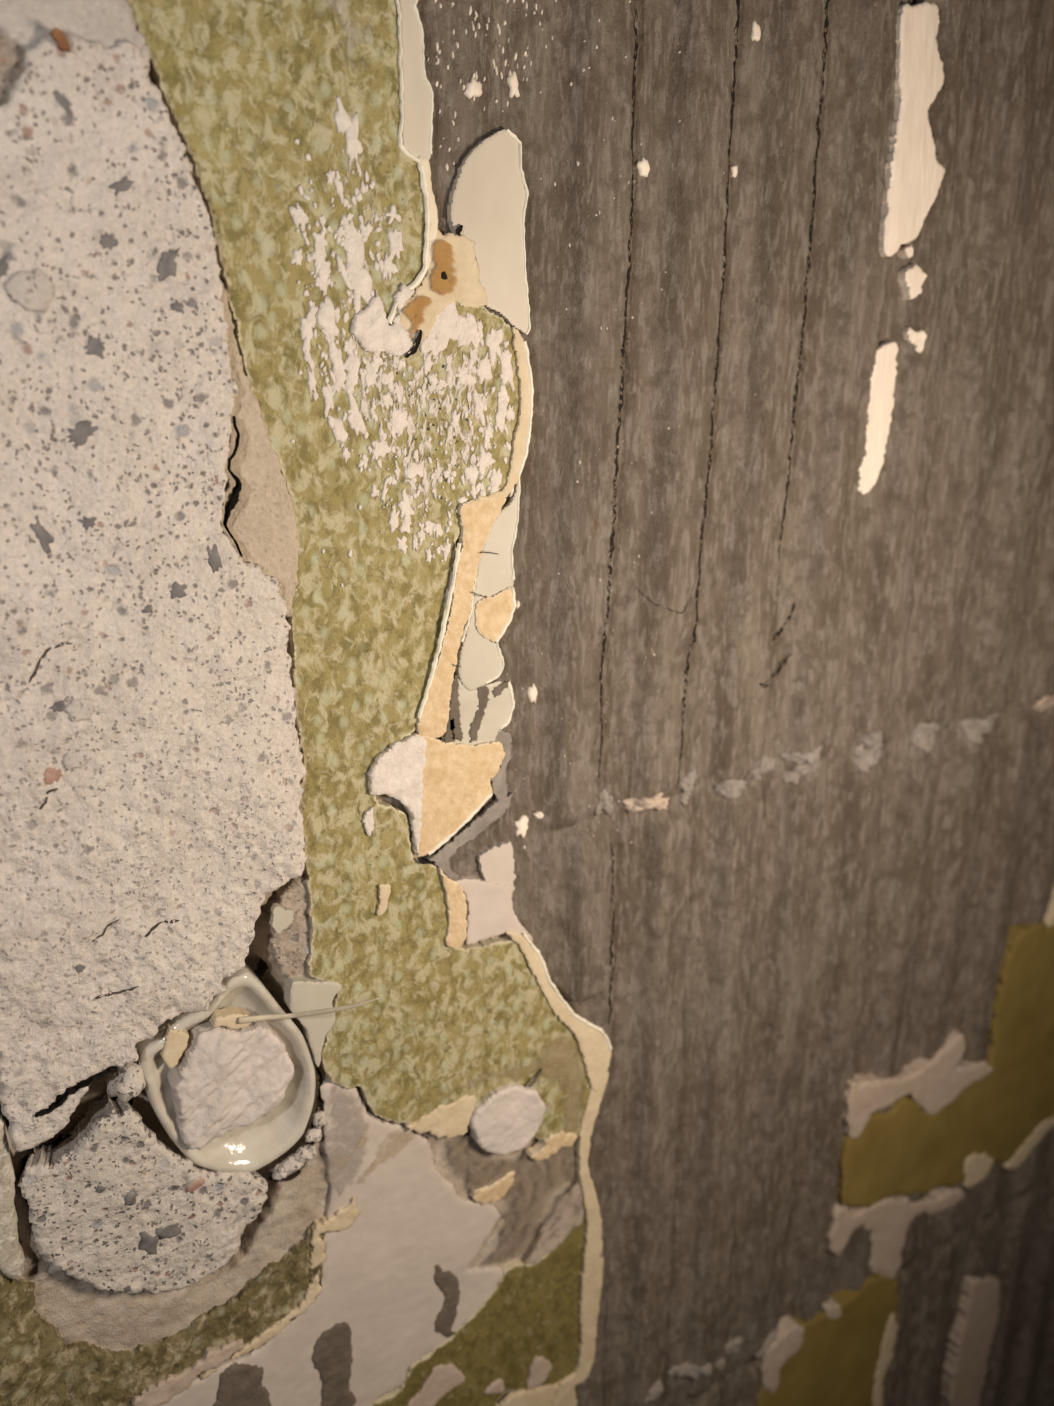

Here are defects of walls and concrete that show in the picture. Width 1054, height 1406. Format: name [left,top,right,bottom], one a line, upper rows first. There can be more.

peeling [879,1,945,300]
damp [289,95,515,606]
corrosion [403,240,457,341]
peeling [857,327,927,494]
peeling [131,0,612,1406]
peeling [827,1186,965,1279]
peeling [941,1275,1001,1406]